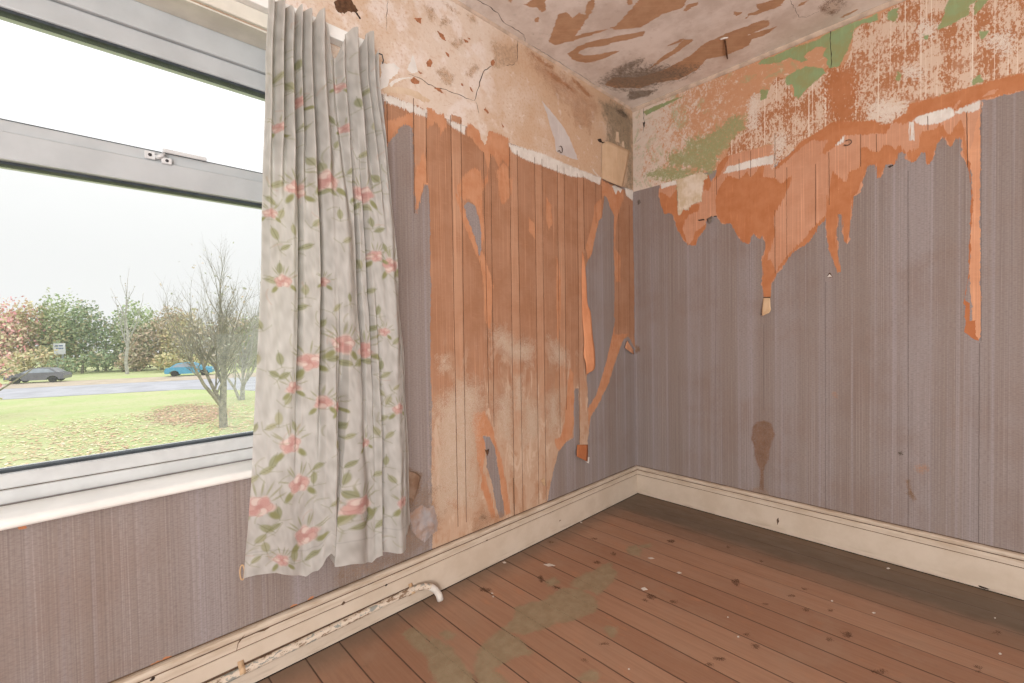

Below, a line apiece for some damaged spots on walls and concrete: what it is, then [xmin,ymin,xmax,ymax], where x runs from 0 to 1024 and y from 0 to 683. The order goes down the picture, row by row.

crack [412,0,598,112]
damp [599,58,702,189]
peeling [604,0,785,88]
peeling [643,0,1024,215]
peeling [963,111,982,341]
peeling [582,251,595,374]
damp [751,420,776,494]